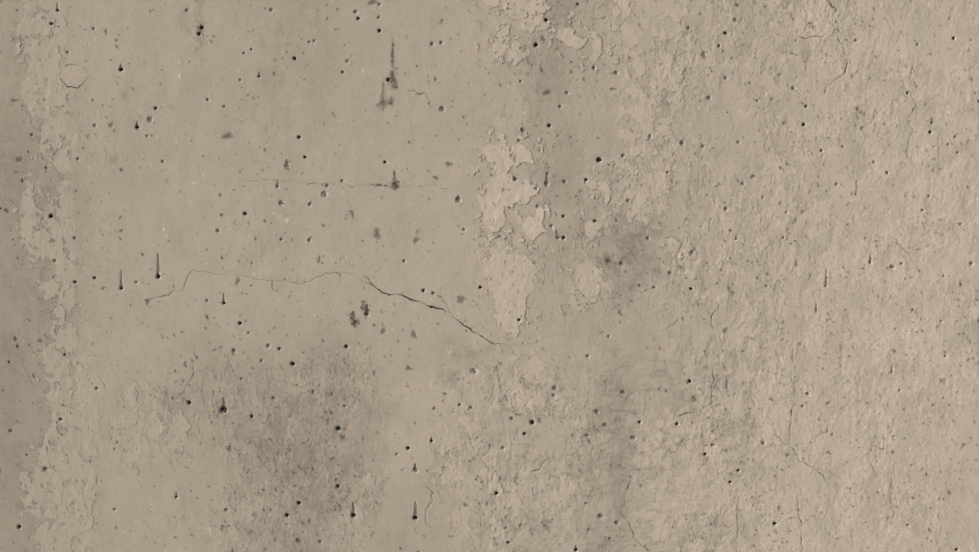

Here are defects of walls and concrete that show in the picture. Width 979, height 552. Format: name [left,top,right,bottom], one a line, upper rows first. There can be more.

crack [798,0,849,93]
peeling [471,0,695,344]
crack [145,270,528,402]
crack [774,349,826,482]
crack [621,480,651,552]